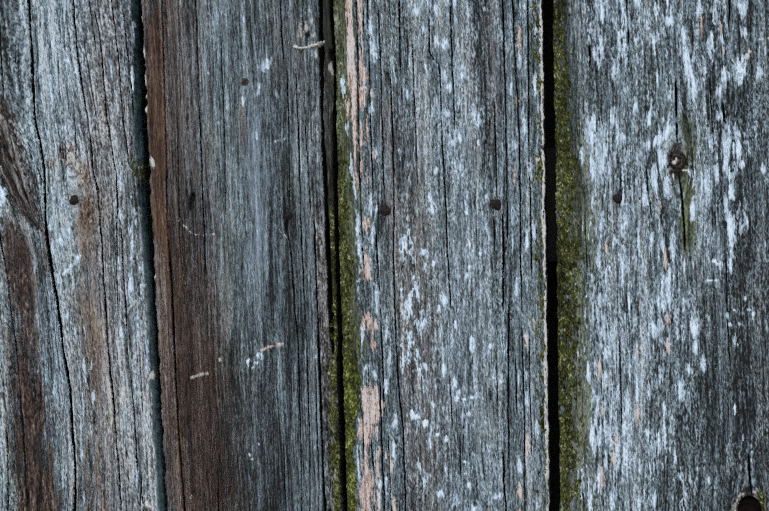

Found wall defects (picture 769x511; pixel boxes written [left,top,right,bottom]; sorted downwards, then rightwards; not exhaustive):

crack [27,0,77,511]
leakage [333,0,366,367]
crack [355,0,455,511]
peeling [340,0,510,511]
peeling [502,269,528,301]
peeling [509,81,527,152]
peeling [516,0,550,511]
leakage [570,155,595,488]